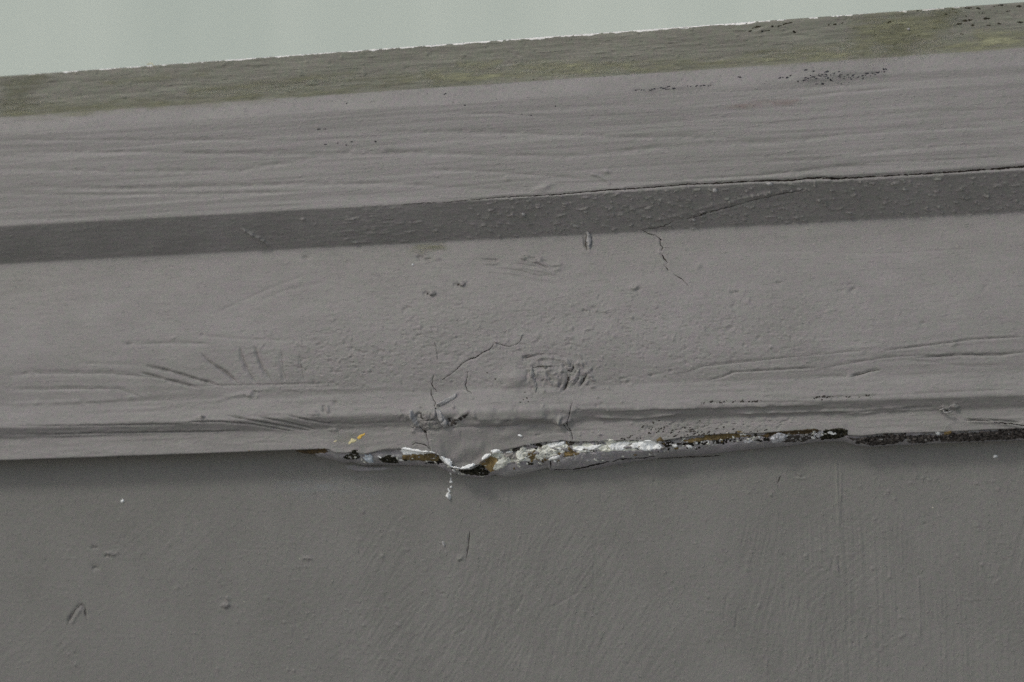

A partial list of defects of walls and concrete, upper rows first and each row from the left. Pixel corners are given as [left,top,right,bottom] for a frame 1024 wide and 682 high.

crack [404,165,1024,283]
crack [431,337,522,406]
peeling [334,420,786,477]
peeling [811,428,849,440]